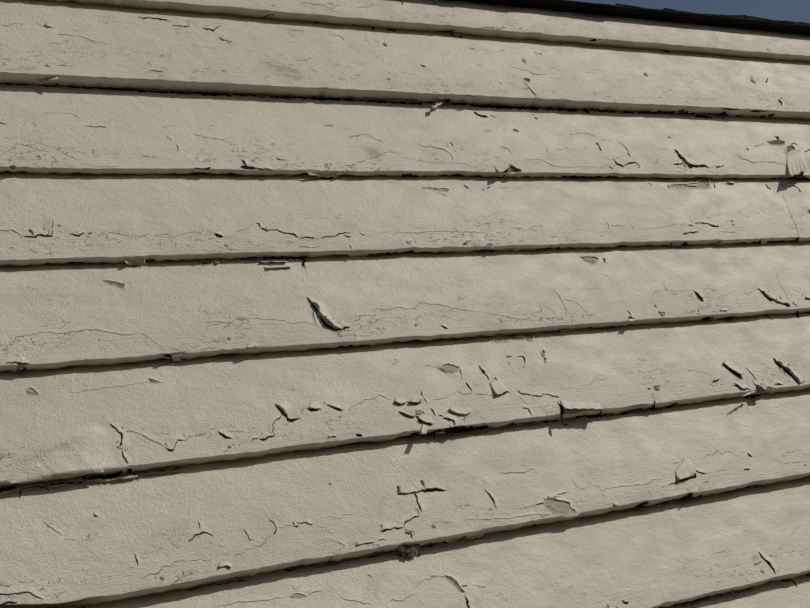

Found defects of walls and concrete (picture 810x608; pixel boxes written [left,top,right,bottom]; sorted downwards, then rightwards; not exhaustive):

crack [0,112,120,167]
peeling [766,136,810,181]
crack [0,212,475,258]
peeling [710,359,743,386]
peeling [773,358,805,385]
crack [110,384,392,464]
peeling [395,391,433,439]
peeling [548,400,603,426]
crack [380,467,549,532]
peeling [535,490,579,517]
crack [754,551,780,574]
crack [465,594,475,608]